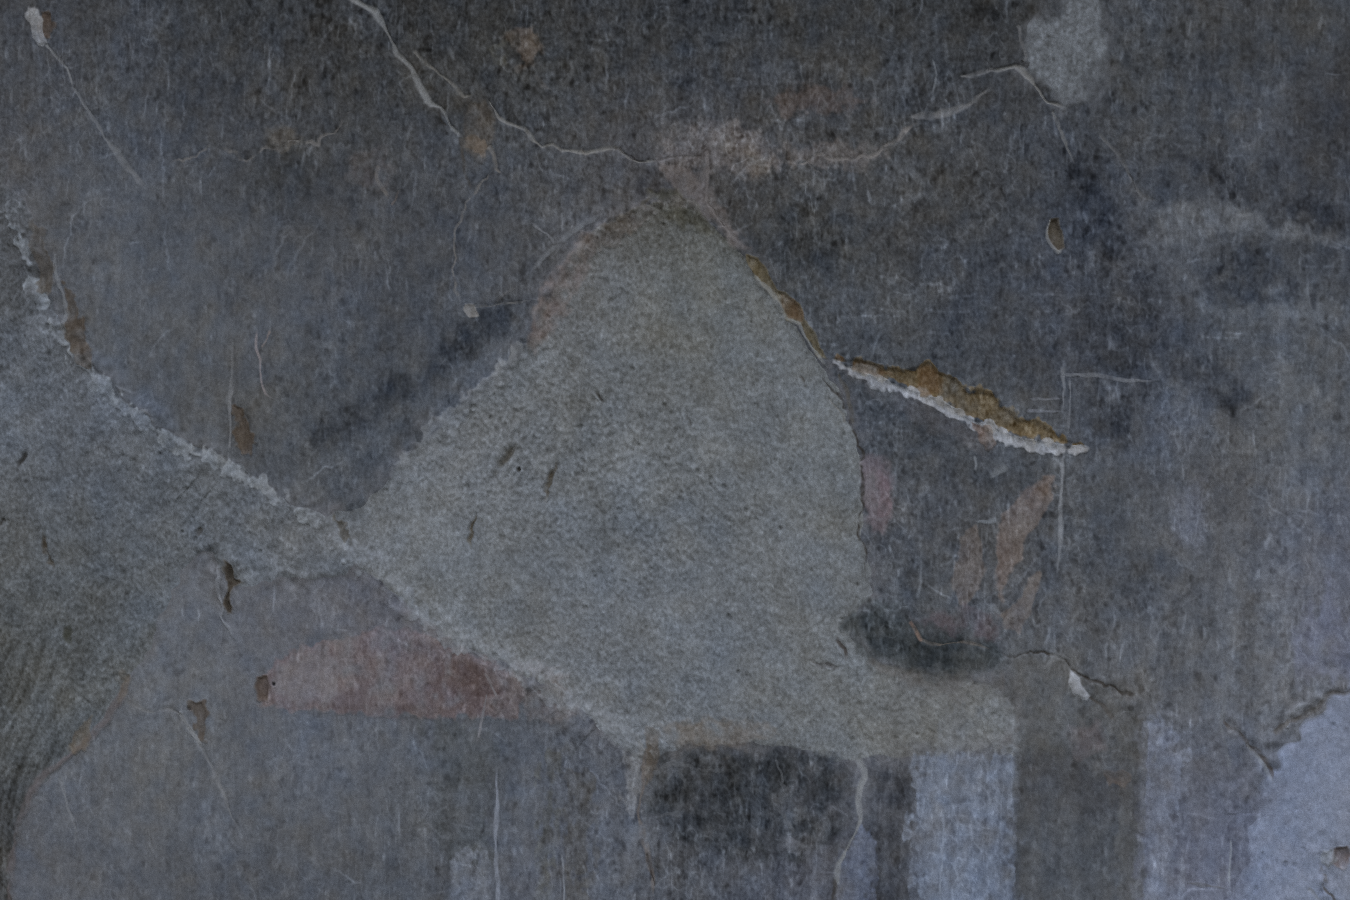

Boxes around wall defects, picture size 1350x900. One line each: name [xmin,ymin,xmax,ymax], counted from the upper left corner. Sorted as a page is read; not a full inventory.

crack [348,0,739,306]
peeling [427,288,536,421]
flaking render [744,253,1091,459]
spalling [487,444,521,480]
spalling [538,459,558,505]
crack [831,756,869,900]
flaking render [1318,844,1350,872]